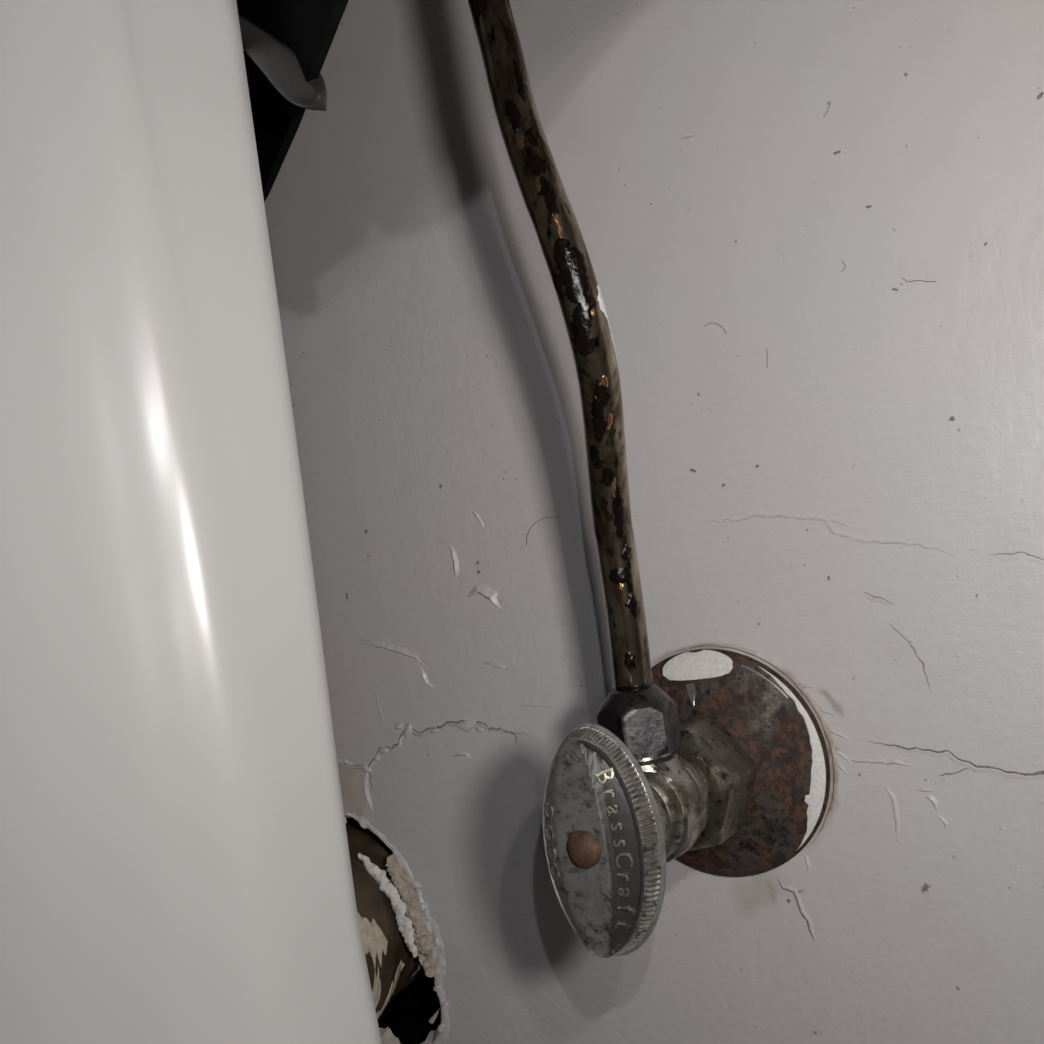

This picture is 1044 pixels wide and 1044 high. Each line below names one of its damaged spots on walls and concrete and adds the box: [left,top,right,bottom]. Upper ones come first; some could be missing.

corrosion [468,0,481,28]
corrosion [506,58,559,217]
corrosion [551,237,597,356]
corrosion [588,383,638,618]
crack [692,510,1044,566]
crack [863,592,931,691]
crack [338,719,529,790]
crack [837,741,1044,838]
flaking render [337,758,450,1044]
crack [777,877,816,941]